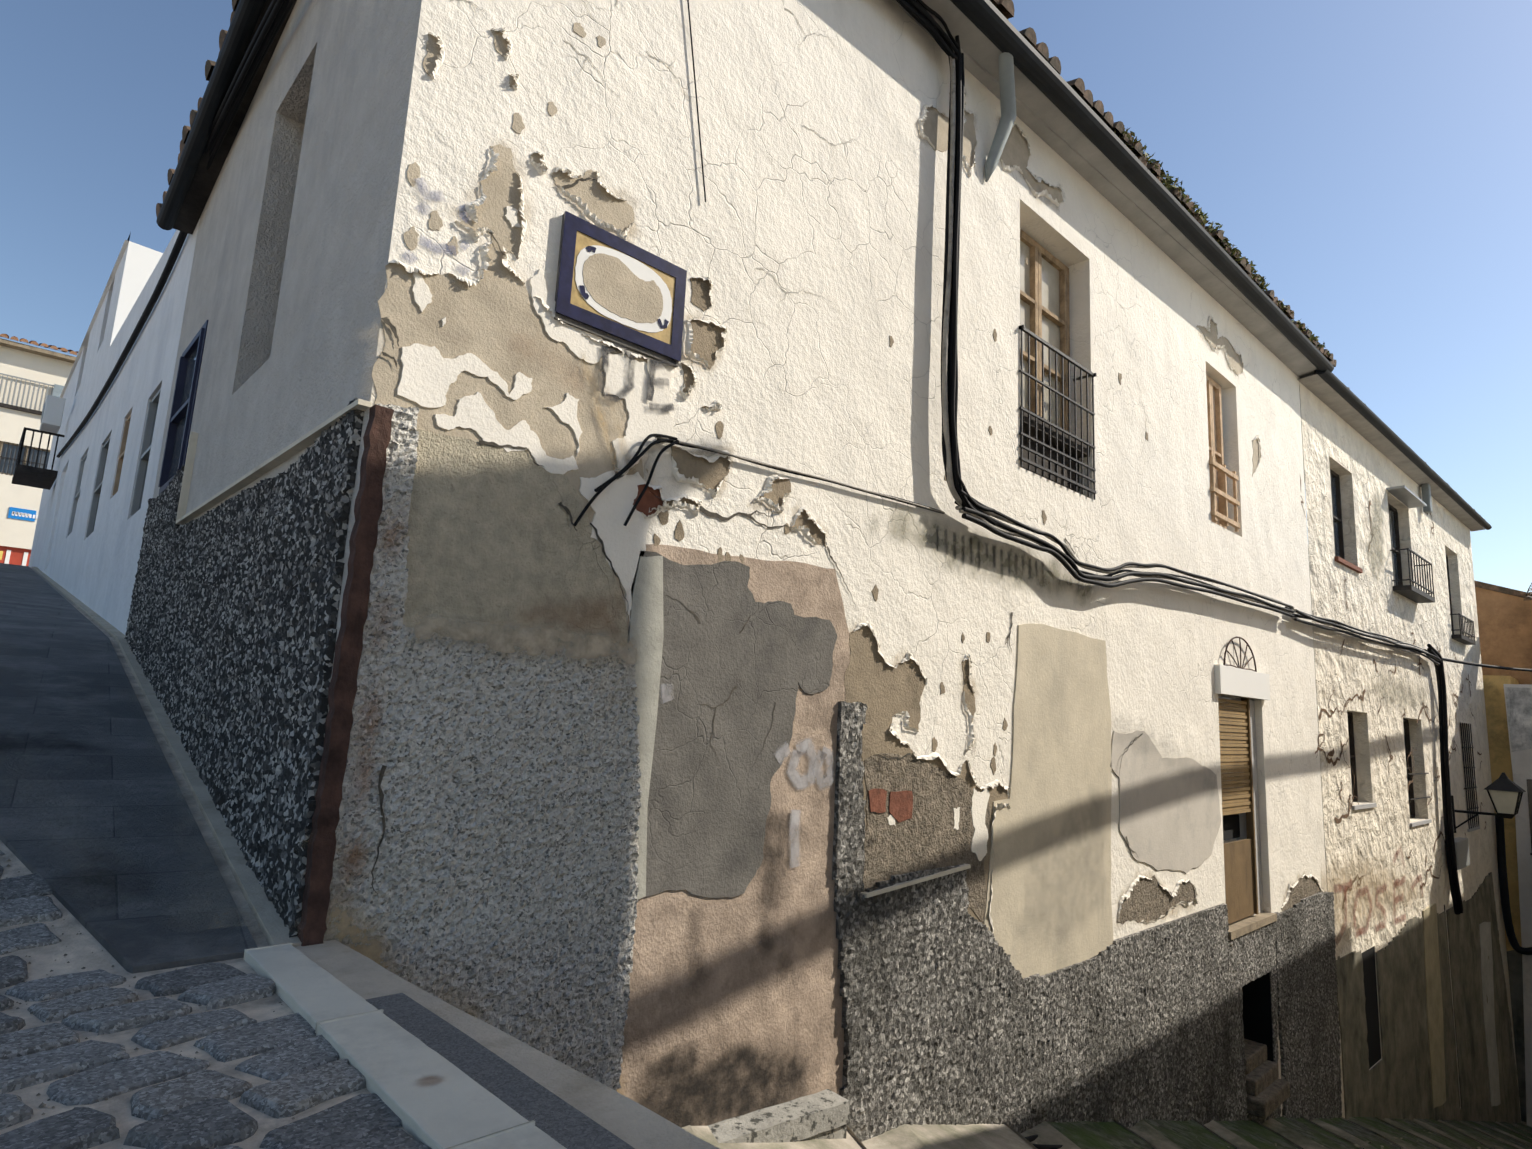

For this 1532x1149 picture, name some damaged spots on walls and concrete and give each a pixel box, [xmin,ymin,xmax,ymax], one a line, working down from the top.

peeling [491,27,519,90]
crack [564,0,618,95]
crack [646,51,712,105]
peeling [918,92,977,177]
crack [562,177,596,190]
peeling [371,113,732,631]
crack [700,506,793,529]
crack [827,546,857,608]
damp [895,514,1091,597]
peeling [844,621,1010,934]
peeling [1117,875,1199,924]
damp [641,1046,803,1128]